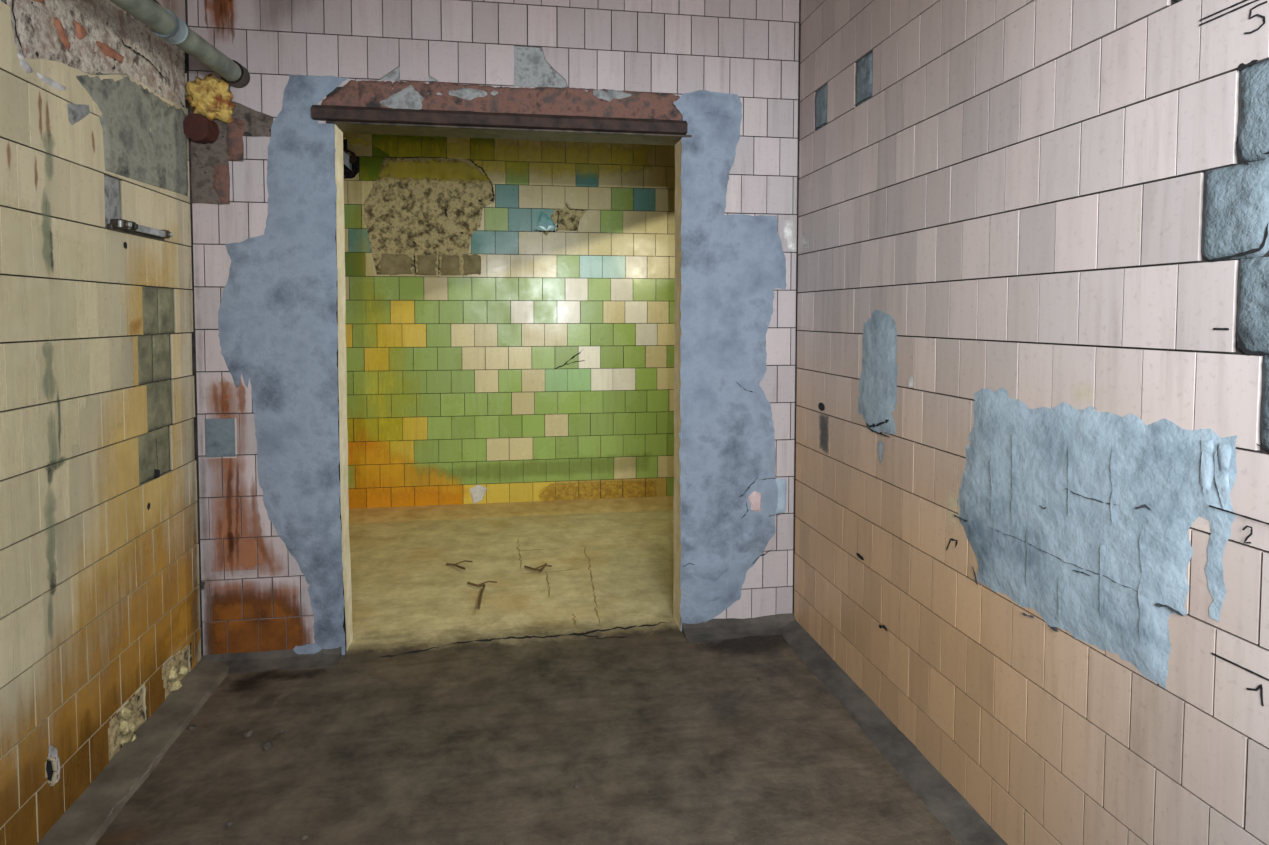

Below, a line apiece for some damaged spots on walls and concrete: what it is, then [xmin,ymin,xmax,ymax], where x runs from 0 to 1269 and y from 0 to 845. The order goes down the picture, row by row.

spalling [0,0,193,125]
rust [204,0,234,37]
peeling [191,101,274,205]
spalling [343,139,366,179]
spalling [363,157,495,276]
peeling [1201,59,1269,451]
peeling [136,286,174,484]
rust [213,383,245,419]
rust [0,458,304,845]